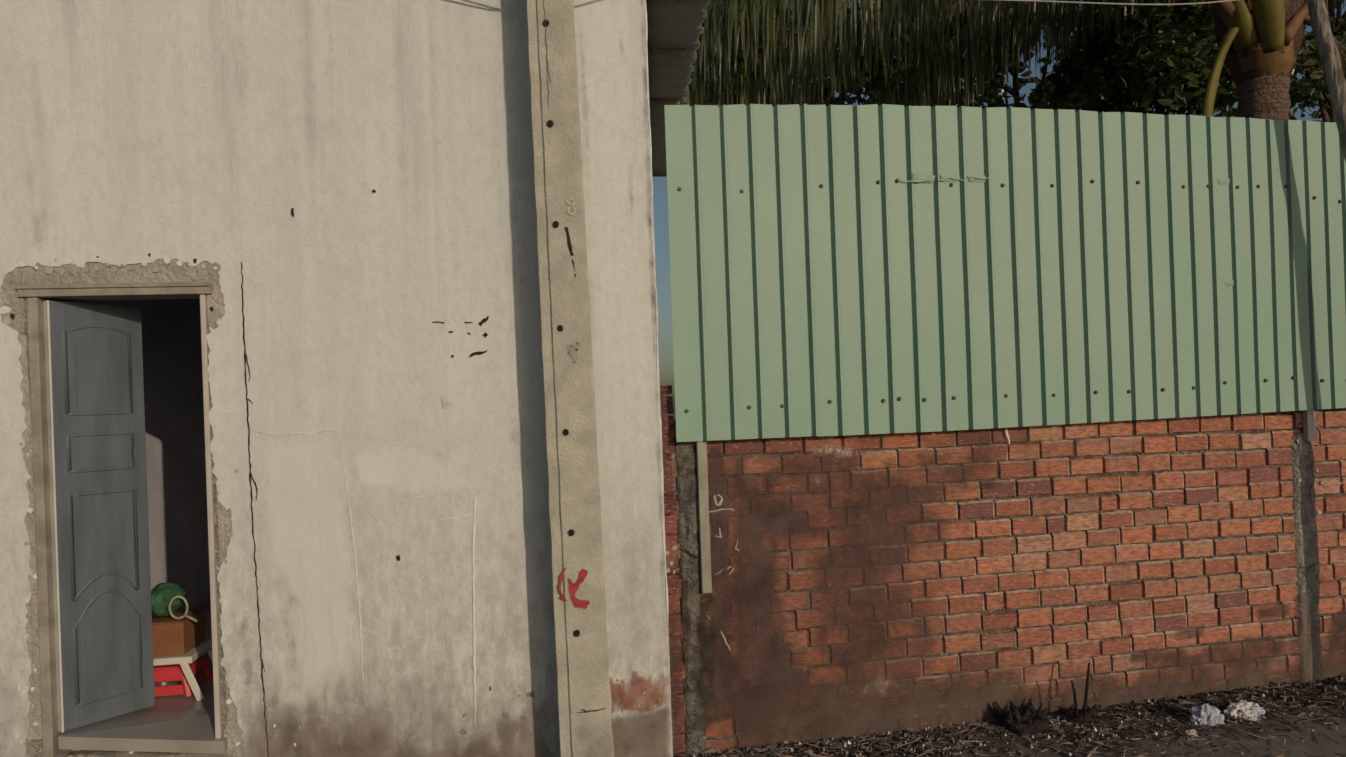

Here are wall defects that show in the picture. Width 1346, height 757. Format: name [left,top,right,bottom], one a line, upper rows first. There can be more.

damp [248,694,553,757]
damp [612,695,682,757]